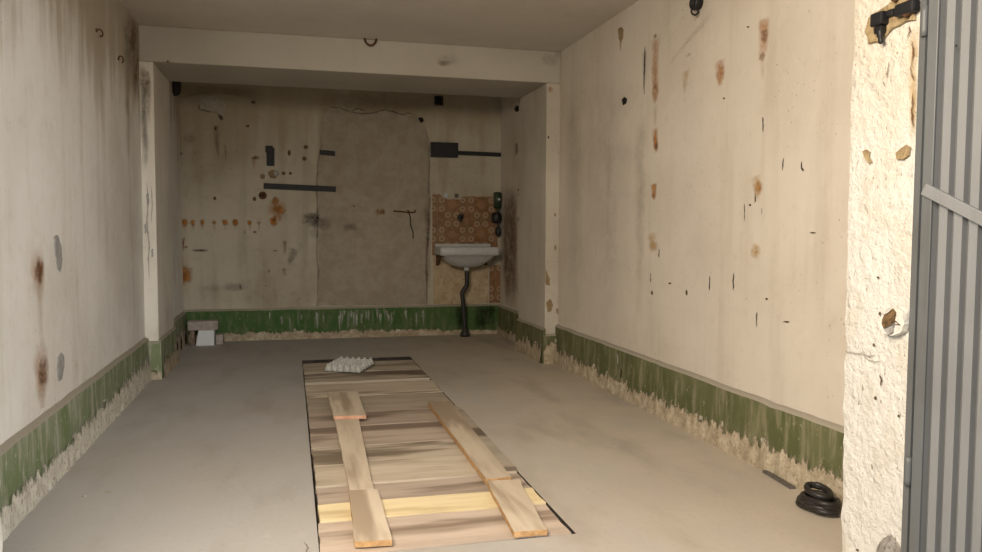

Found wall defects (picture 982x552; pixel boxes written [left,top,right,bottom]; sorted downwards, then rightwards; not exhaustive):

spalling [879,306,909,337]
spalling [0,353,162,542]
spalling [215,326,843,511]